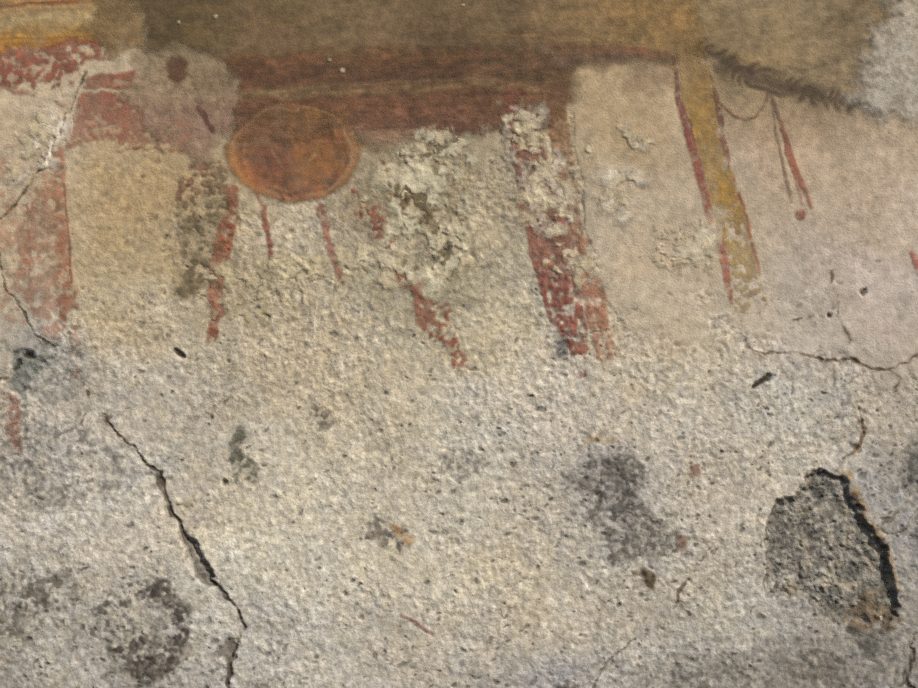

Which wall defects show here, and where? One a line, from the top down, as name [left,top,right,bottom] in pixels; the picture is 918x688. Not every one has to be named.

crack [0,266,55,346]
crack [66,413,241,619]
spalling [763,470,897,632]
leakage [137,581,187,631]
crack [214,639,237,688]